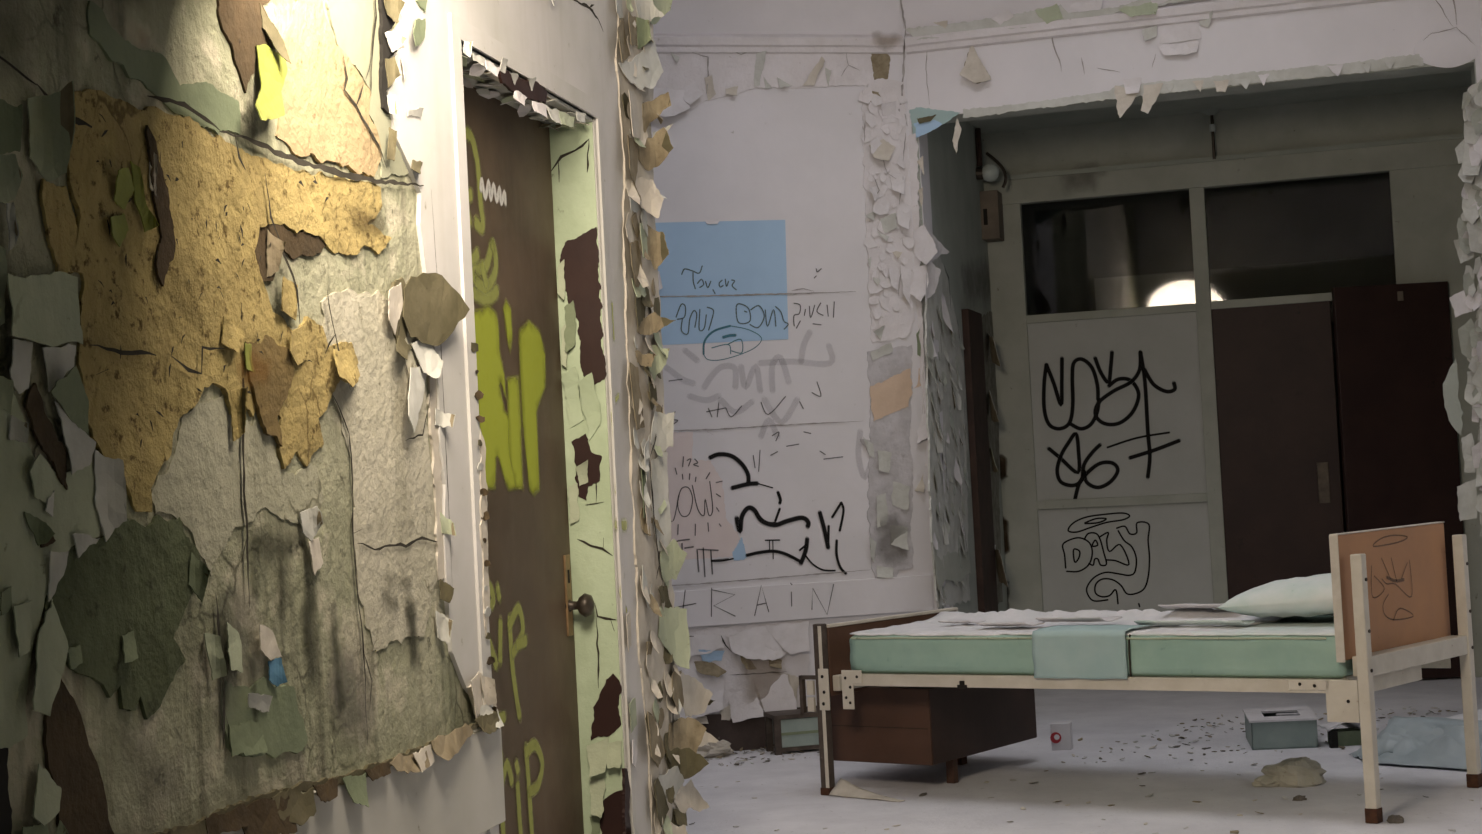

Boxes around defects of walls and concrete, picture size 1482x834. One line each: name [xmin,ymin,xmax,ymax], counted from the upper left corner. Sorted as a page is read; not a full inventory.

flaking render [0,0,504,834]
crack [332,326,452,746]
peeling [462,41,589,132]
peeling [587,0,1424,834]
peeling [1443,79,1482,537]